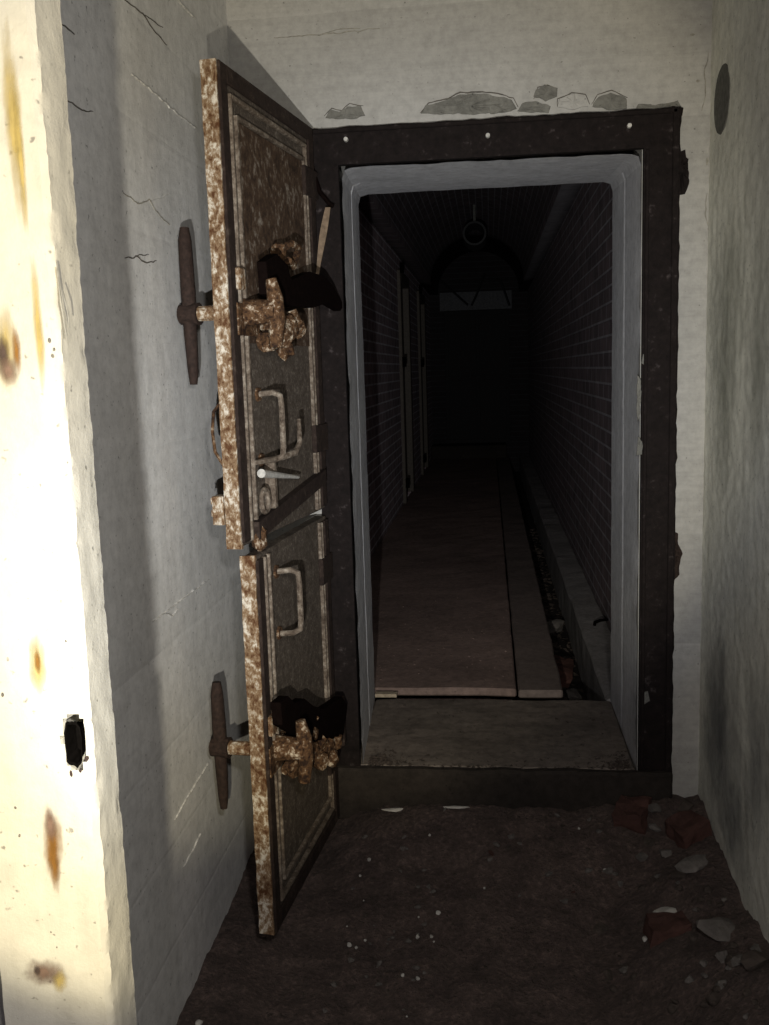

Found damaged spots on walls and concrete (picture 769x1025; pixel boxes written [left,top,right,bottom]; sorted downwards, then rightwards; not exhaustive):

flaking render [420,85,683,115]
rust [34,285,43,365]
rust [0,328,20,380]
rust [47,815,58,881]
rust [35,966,64,987]